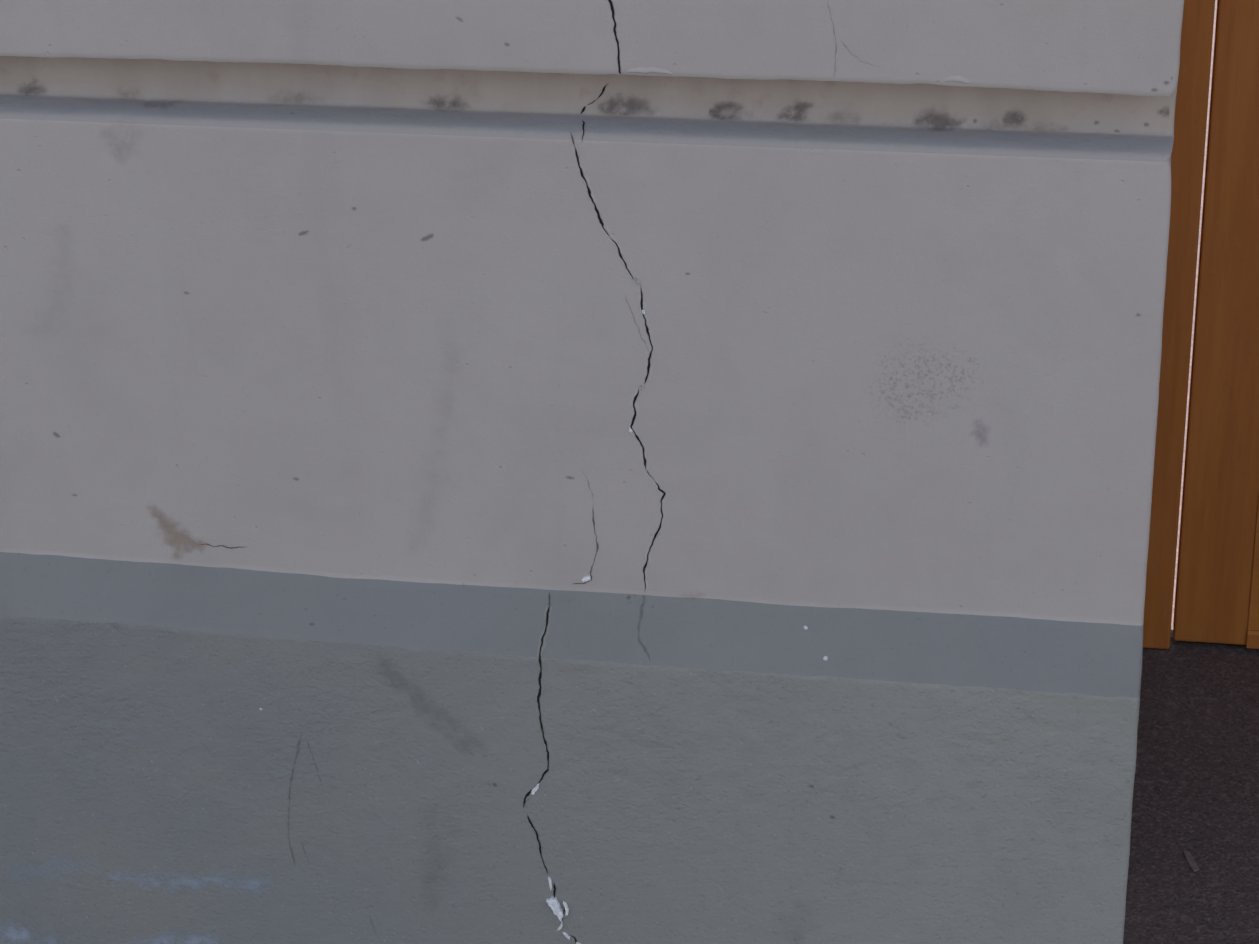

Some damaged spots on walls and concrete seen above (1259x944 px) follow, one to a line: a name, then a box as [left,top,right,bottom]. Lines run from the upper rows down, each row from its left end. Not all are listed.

crack [570,0,667,662]
crack [521,511,598,944]